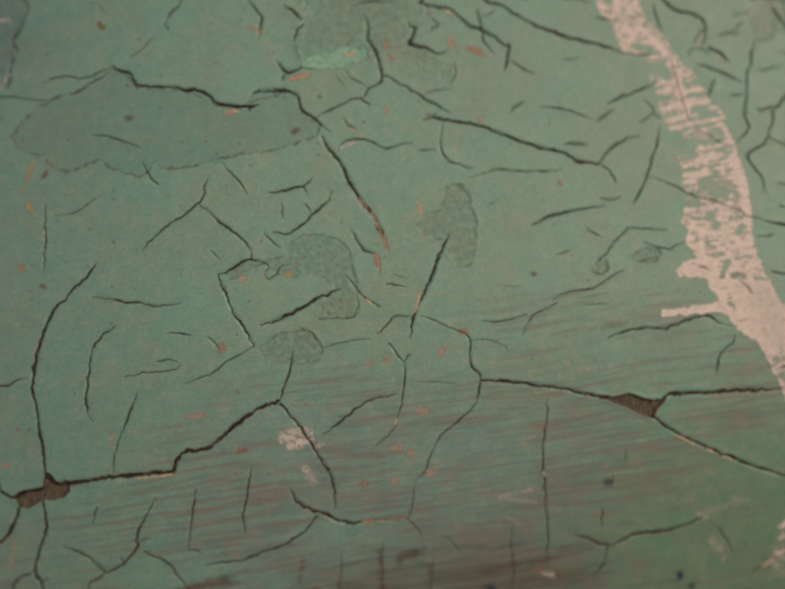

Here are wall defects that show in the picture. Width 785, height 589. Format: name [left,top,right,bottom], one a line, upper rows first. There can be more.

crack [44,0,785,270]
crack [0,178,624,589]
crack [608,314,785,399]
crack [649,415,785,476]
crack [575,507,733,579]
crack [752,547,785,573]